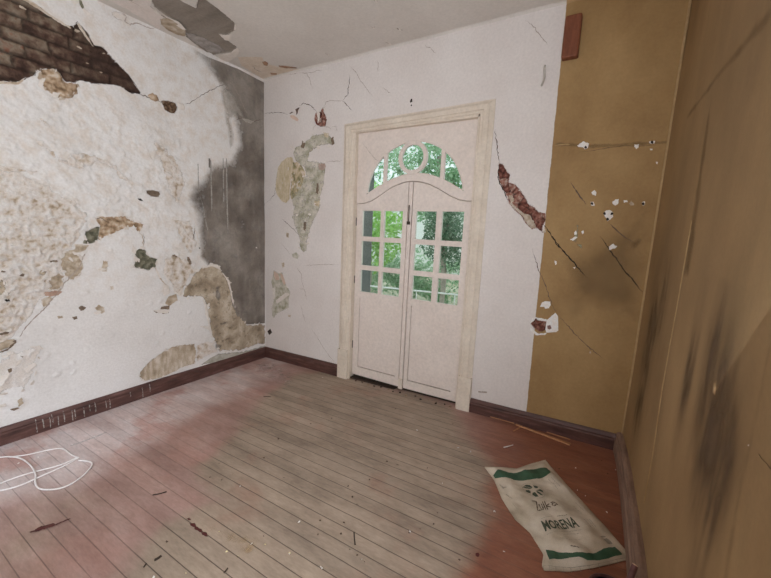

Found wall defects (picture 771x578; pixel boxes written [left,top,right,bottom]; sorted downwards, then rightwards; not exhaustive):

spalling [0,0,185,113]
peeling [112,0,240,62]
crack [187,69,390,131]
leakage [194,58,265,324]
peeling [275,107,335,259]
spalling [498,163,546,233]
peeling [32,216,272,381]
peeling [271,263,291,317]
spalling [530,313,558,335]
crack [543,224,583,273]
crack [603,224,642,291]
peeling [0,339,44,411]